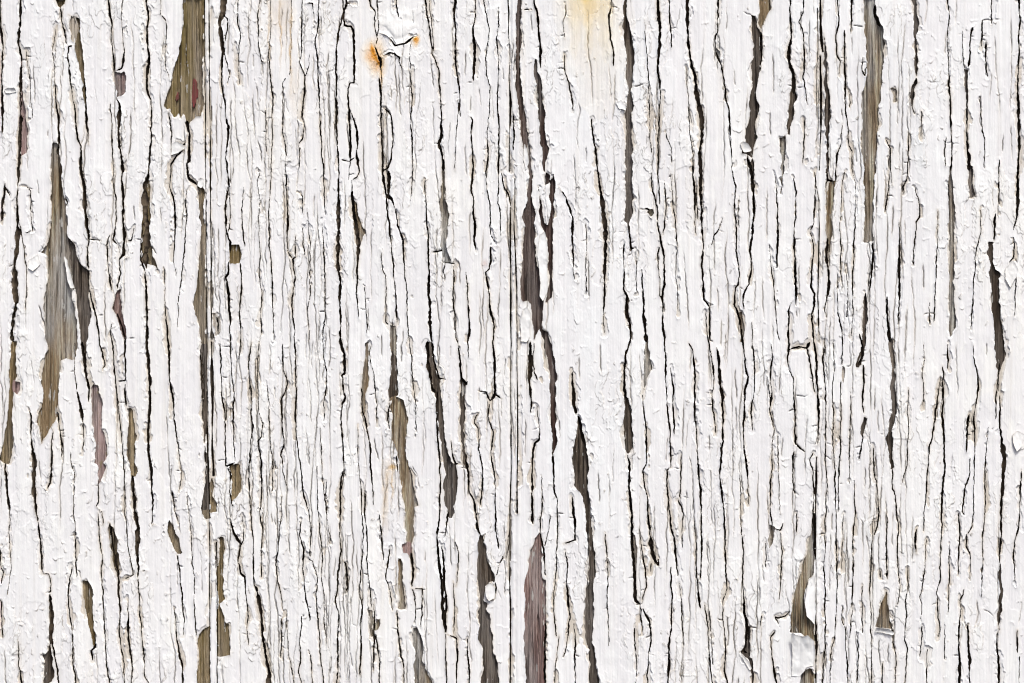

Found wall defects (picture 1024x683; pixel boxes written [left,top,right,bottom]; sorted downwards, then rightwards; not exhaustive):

peeling [37,143,108,486]
peeling [164,0,205,123]
crack [0,0,515,683]
peeling [388,324,418,609]
peeling [477,535,499,683]
peeling [523,533,546,683]
peeling [515,0,558,454]
peeling [572,416,599,683]
peeling [616,0,635,251]
peeling [741,0,771,180]
crack [524,0,1024,683]
peeling [861,0,897,243]